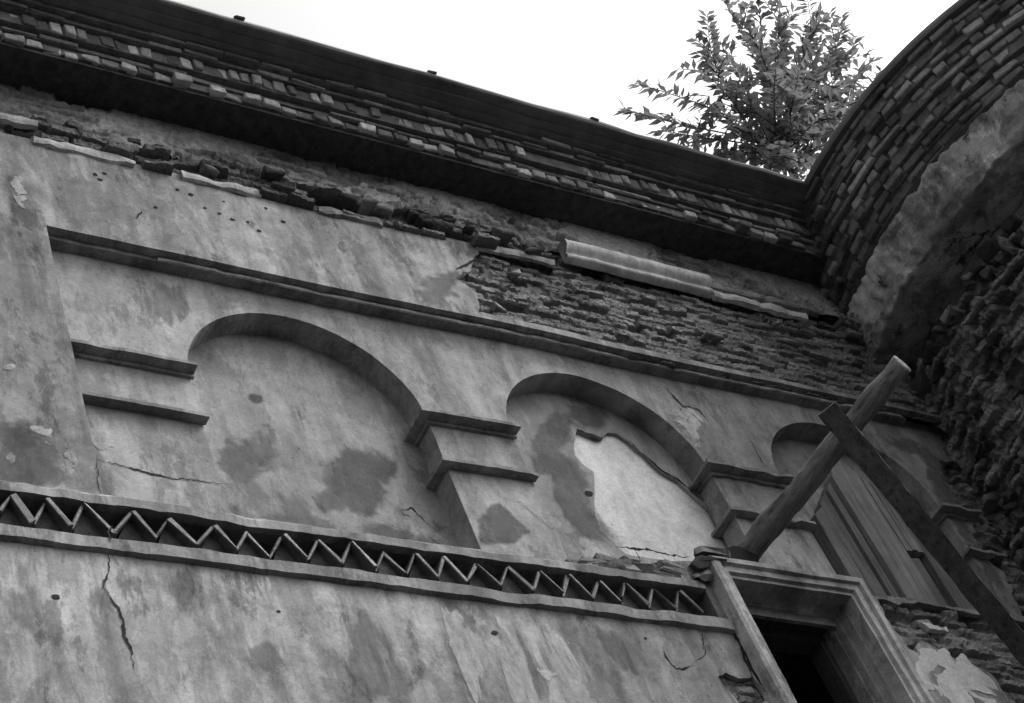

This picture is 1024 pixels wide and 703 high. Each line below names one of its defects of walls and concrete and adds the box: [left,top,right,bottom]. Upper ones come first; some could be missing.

peeling [10,174,27,207]
flaking render [457,251,890,404]
crack [96,455,229,493]
damp [220,439,274,481]
damp [269,449,439,544]
damp [533,406,614,540]
crack [102,525,137,676]
crack [615,546,687,562]
flaking render [872,595,1024,703]